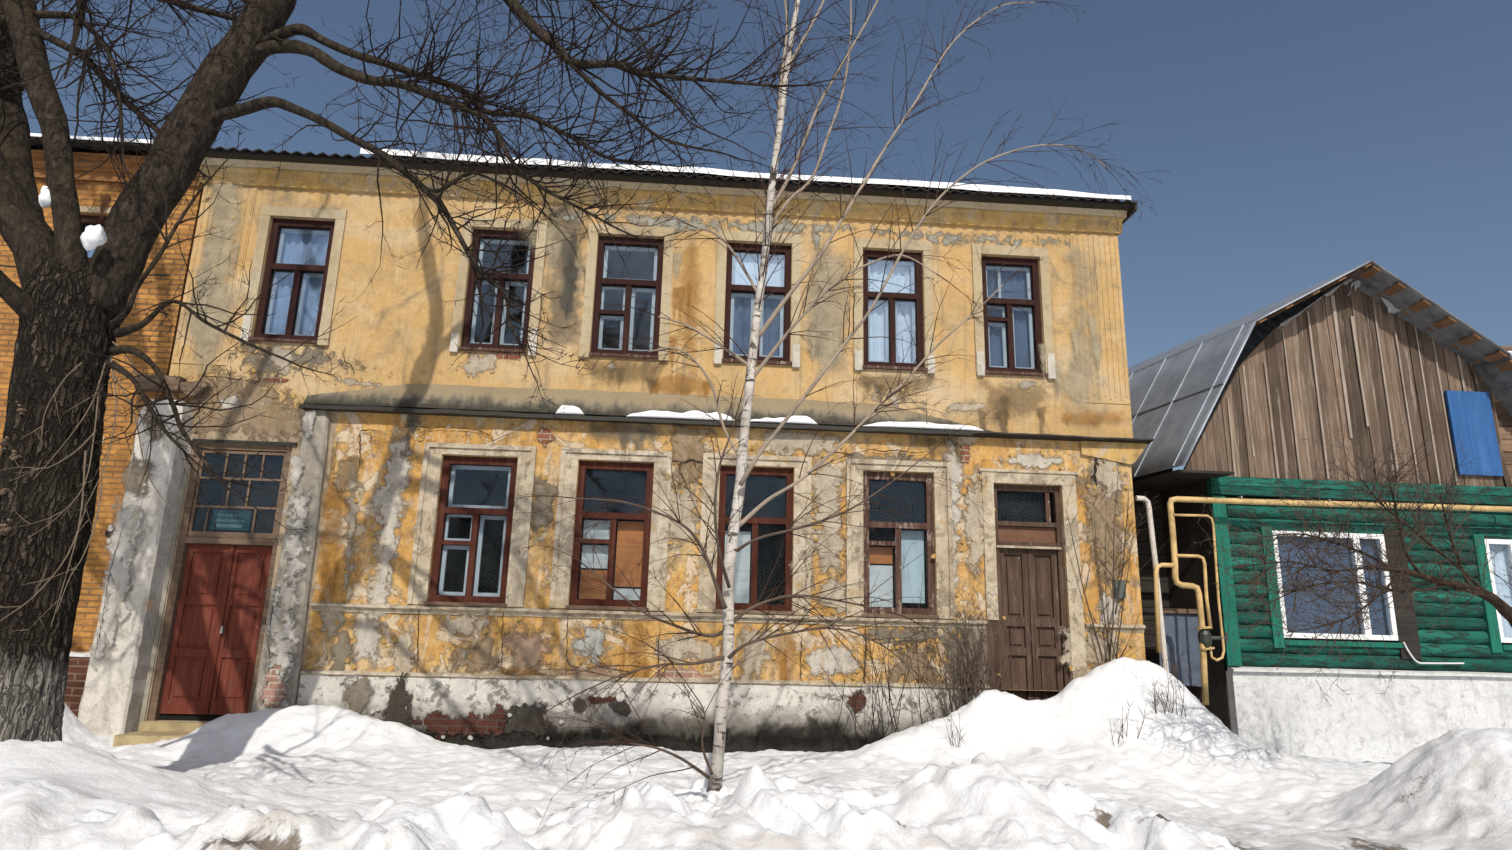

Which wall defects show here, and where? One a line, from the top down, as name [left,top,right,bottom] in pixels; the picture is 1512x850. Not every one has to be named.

leakage [540,206,586,341]
spalling [174,183,632,741]
spalling [664,425,715,549]
peeling [88,453,154,669]
peeling [750,429,1006,716]
peeling [654,634,716,684]
peeling [735,622,776,685]